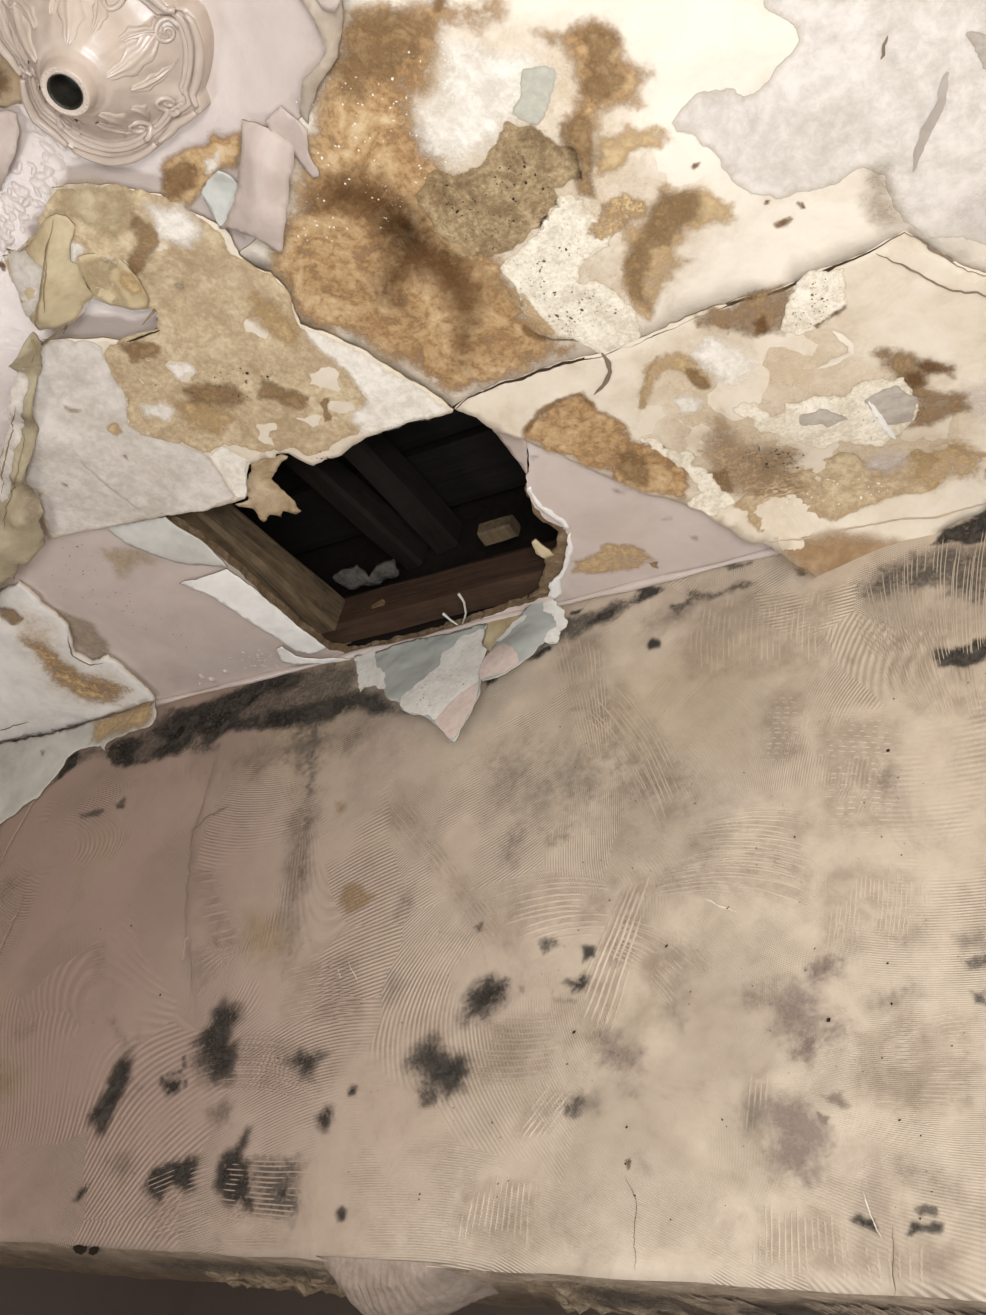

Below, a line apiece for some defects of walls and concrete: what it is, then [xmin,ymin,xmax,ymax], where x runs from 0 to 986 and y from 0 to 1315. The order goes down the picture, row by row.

peeling [672,0,986,244]
water stain [21,0,664,456]
water stain [620,185,732,320]
crack [456,232,986,409]
peeling [0,213,573,742]
water stain [524,347,986,602]
water stain [57,663,394,779]
water stain [530,587,660,659]
water stain [934,638,986,683]
water stain [89,1058,131,1134]
water stain [133,1158,197,1202]
water stain [215,1129,297,1214]